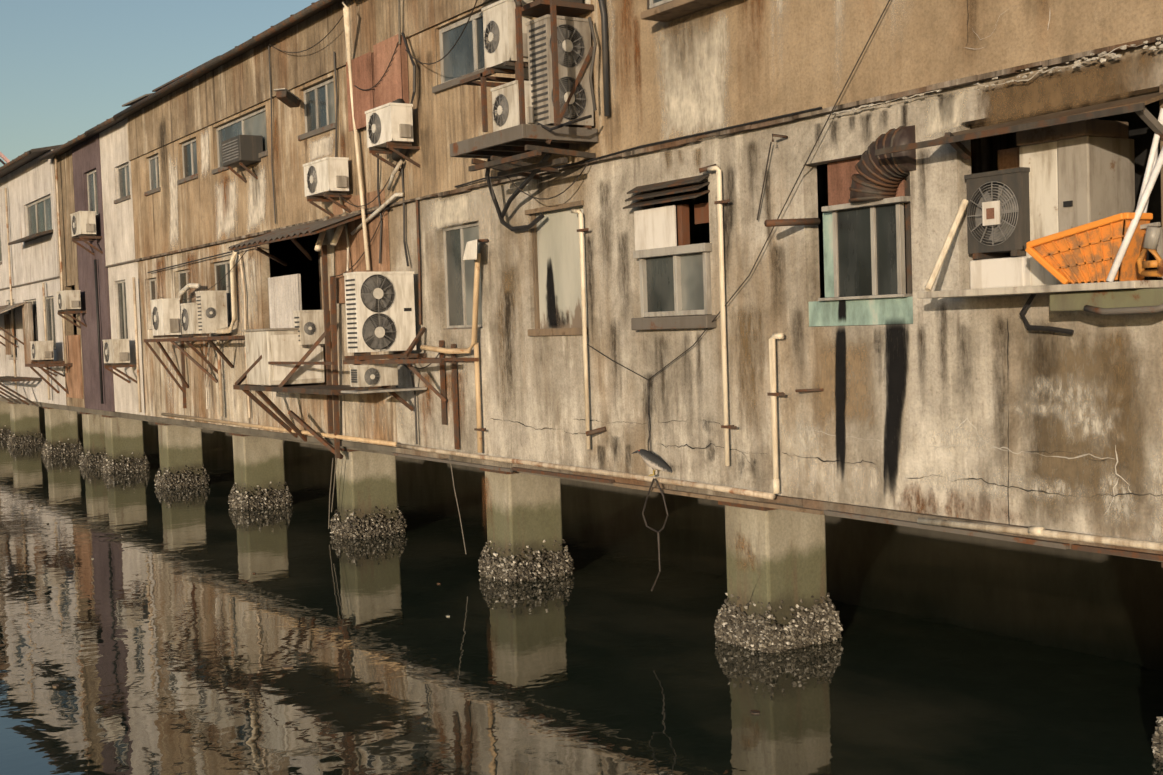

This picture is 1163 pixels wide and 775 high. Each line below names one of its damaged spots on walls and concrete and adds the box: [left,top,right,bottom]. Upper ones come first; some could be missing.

spalling [976,37,1163,90]
crack [491,374,1163,517]
damp [793,296,925,495]
damp [998,318,1018,525]
damp [1030,333,1163,539]